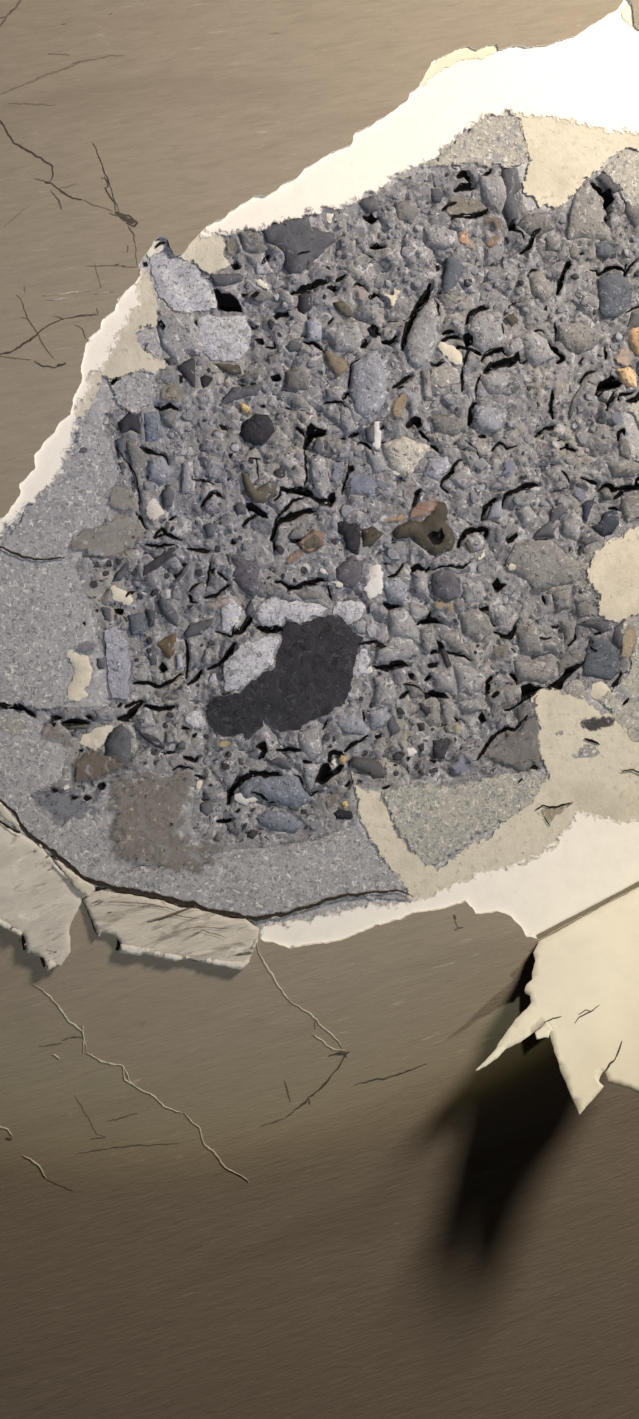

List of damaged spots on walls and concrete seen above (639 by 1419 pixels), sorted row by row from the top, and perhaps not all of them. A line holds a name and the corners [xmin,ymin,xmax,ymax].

crack [0,0,22,27]
crack [0,120,138,368]
spalling [0,0,639,971]
crack [0,799,413,1051]
crack [0,1126,73,1191]
crack [32,983,249,1182]
peeling [535,1021,554,1039]